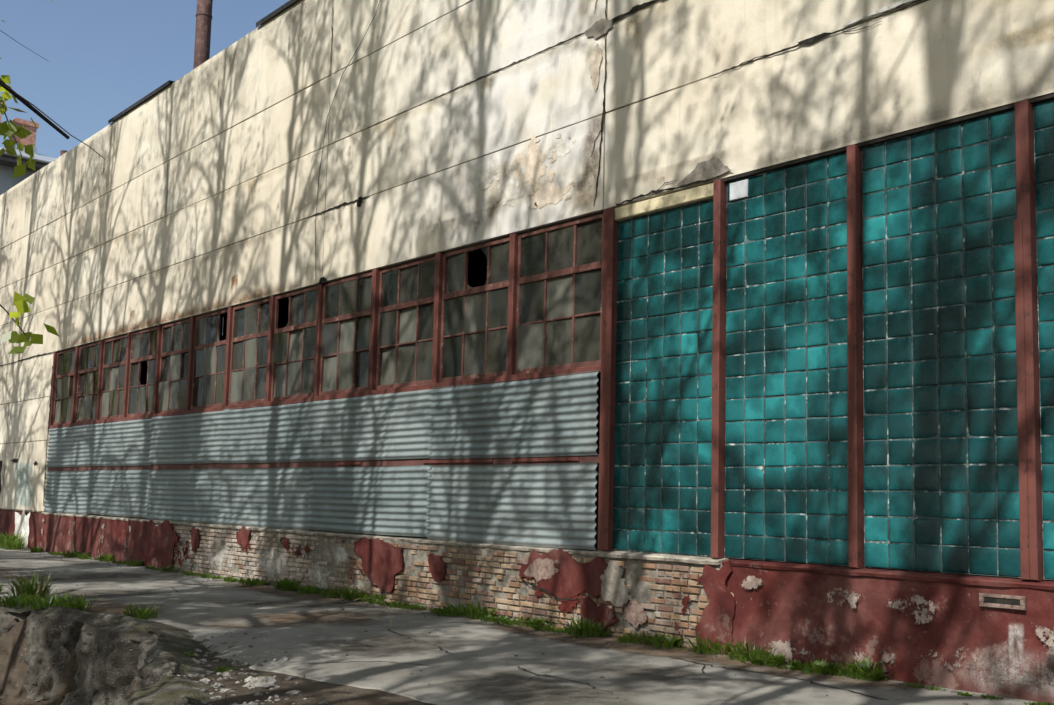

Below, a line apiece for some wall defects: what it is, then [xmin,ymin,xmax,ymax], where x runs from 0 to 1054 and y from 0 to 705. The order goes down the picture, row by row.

crack [829,0,922,35]
peeling [585,18,613,91]
crack [712,43,802,76]
crack [420,0,719,206]
peeling [467,133,577,209]
spalling [676,156,733,187]
crack [308,196,369,218]
spalling [521,555,560,581]
spalling [600,560,647,634]
peeling [742,575,763,590]
peeling [826,587,861,609]
peeling [887,595,936,624]